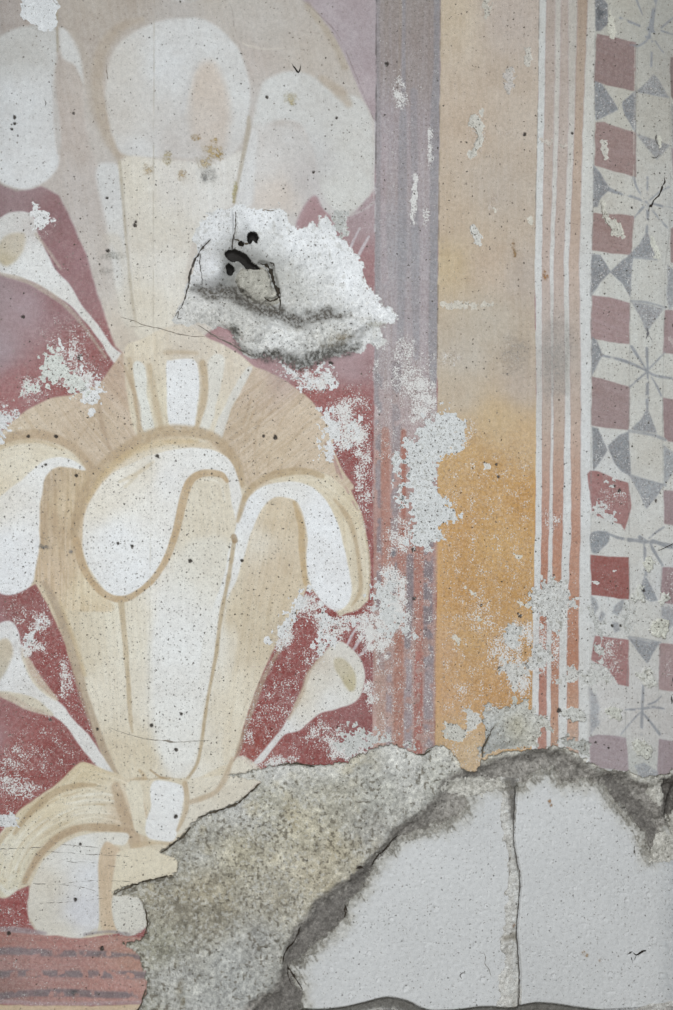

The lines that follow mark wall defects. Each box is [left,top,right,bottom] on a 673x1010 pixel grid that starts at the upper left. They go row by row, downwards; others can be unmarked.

flaking render [20,0,61,32]
peeling [0,337,107,445]
peeling [388,402,467,553]
flaking render [114,571,673,1010]